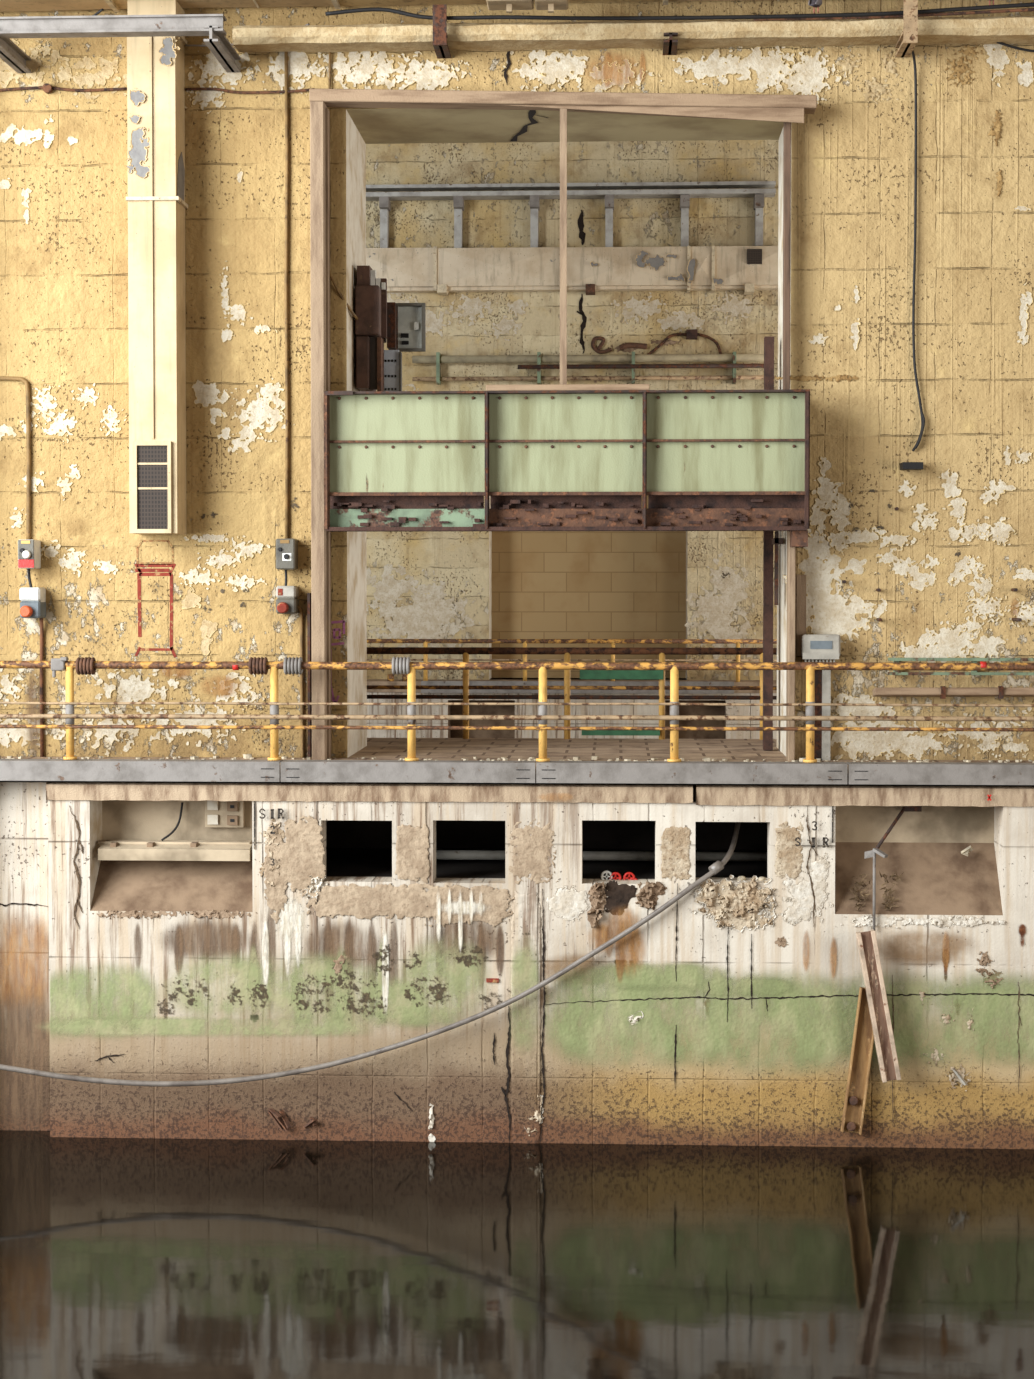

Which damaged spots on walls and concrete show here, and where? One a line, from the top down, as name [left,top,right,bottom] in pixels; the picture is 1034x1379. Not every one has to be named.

peeling [159,37,476,114]
crack [577,294,587,354]
peeling [0,379,127,444]
peeling [192,378,295,454]
peeling [783,445,1034,663]
peeling [0,668,265,757]
peeling [830,690,1034,760]
water stain [157,890,504,1020]
rust [596,913,640,976]
water stain [890,934,960,966]
water stain [0,928,49,1121]
crack [492,883,1034,1143]